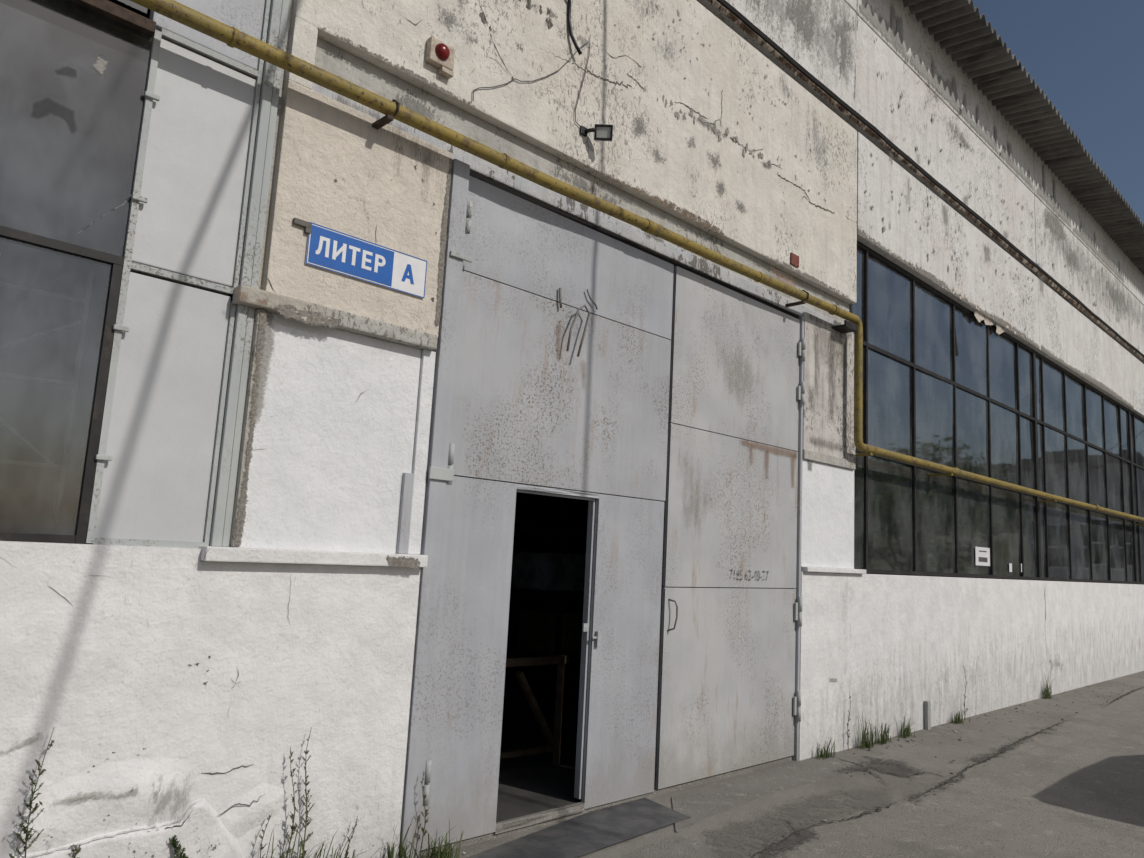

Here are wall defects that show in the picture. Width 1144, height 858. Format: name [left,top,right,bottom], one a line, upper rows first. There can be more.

crack [554,53,857,223]
damp [809,335,848,418]
spalling [387,555,420,569]
crack [204,764,253,775]
crack [220,794,265,815]